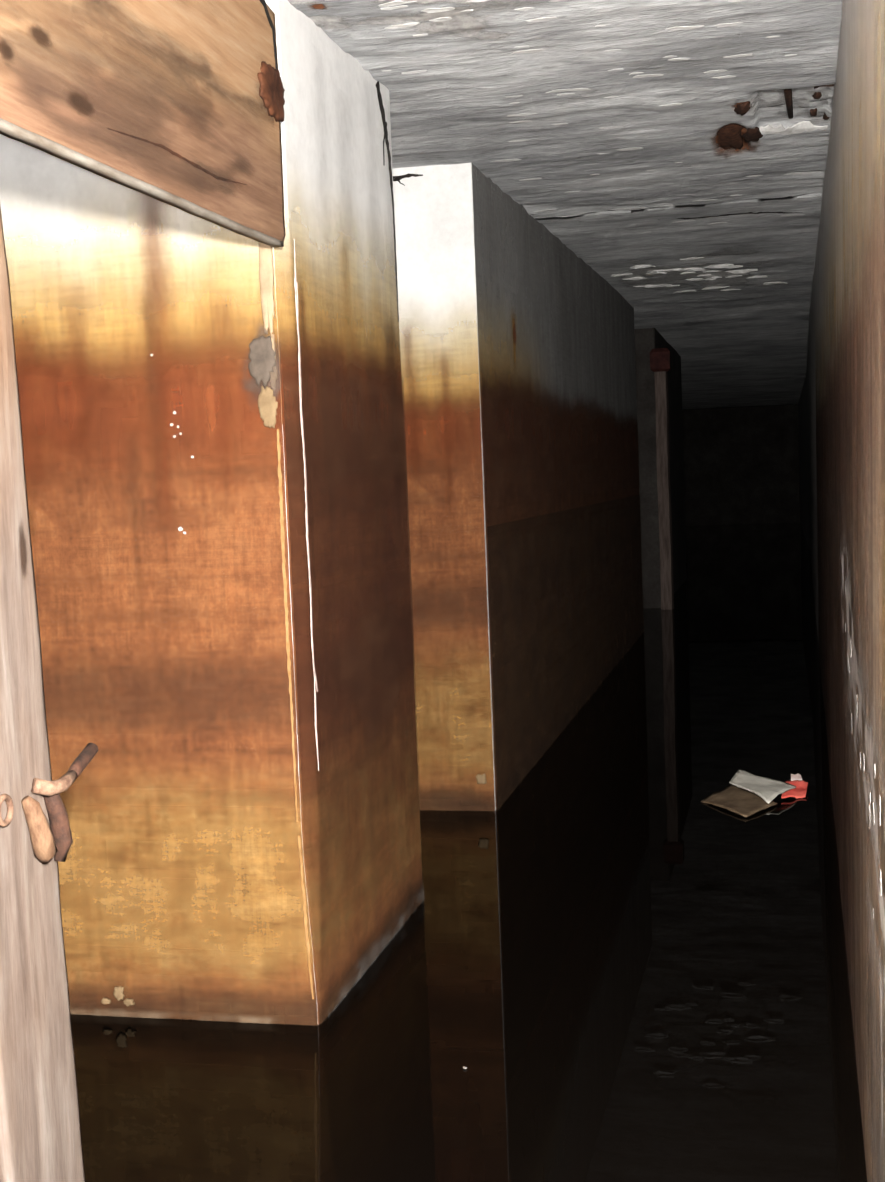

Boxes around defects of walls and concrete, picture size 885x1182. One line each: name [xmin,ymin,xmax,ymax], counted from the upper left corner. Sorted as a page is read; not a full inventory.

spalling [247,242,314,999]
leakage [816,140,885,1182]